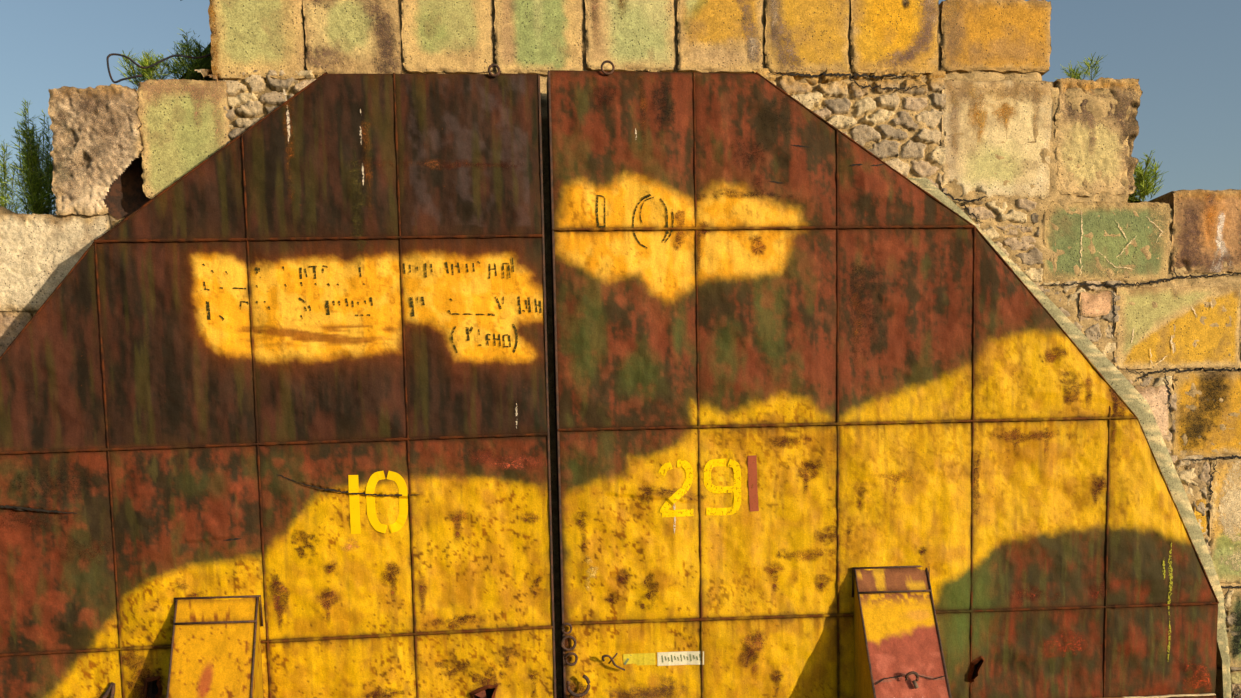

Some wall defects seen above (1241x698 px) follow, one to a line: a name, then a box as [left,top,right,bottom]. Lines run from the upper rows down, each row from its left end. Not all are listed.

leakage [363,0,400,73]
corrosion [968,98,1014,139]
spalling [51,86,140,201]
leakage [1178,373,1228,445]
corrosion [994,428,1053,451]
corrosion [798,460,822,491]
corrosion [766,525,851,589]
corrosion [270,575,289,623]
corrosion [318,588,338,618]
corrosion [383,563,399,596]
corrosion [641,574,659,609]
corrosion [435,647,517,686]